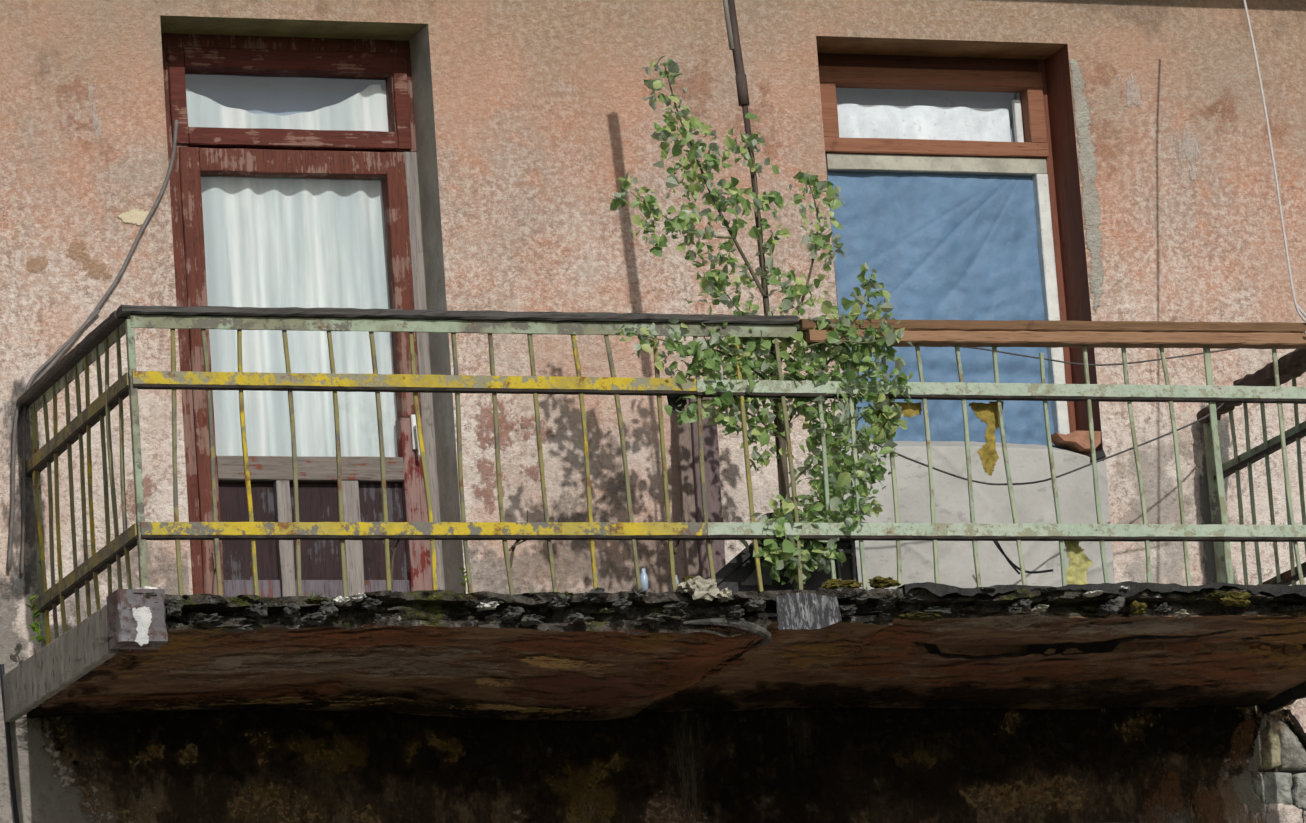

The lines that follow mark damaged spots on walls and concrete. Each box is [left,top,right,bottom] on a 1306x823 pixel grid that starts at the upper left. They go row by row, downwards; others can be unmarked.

flaking render [1070,59,1104,310]
spalling [132,592,383,646]
spalling [464,576,766,626]
spalling [839,590,951,616]
spalling [1005,586,1057,616]
spalling [1082,586,1130,617]
spalling [1154,603,1189,618]
crack [914,623,1306,660]
crack [1286,709,1306,740]
water stain [32,705,1291,823]
spalling [1232,709,1306,823]